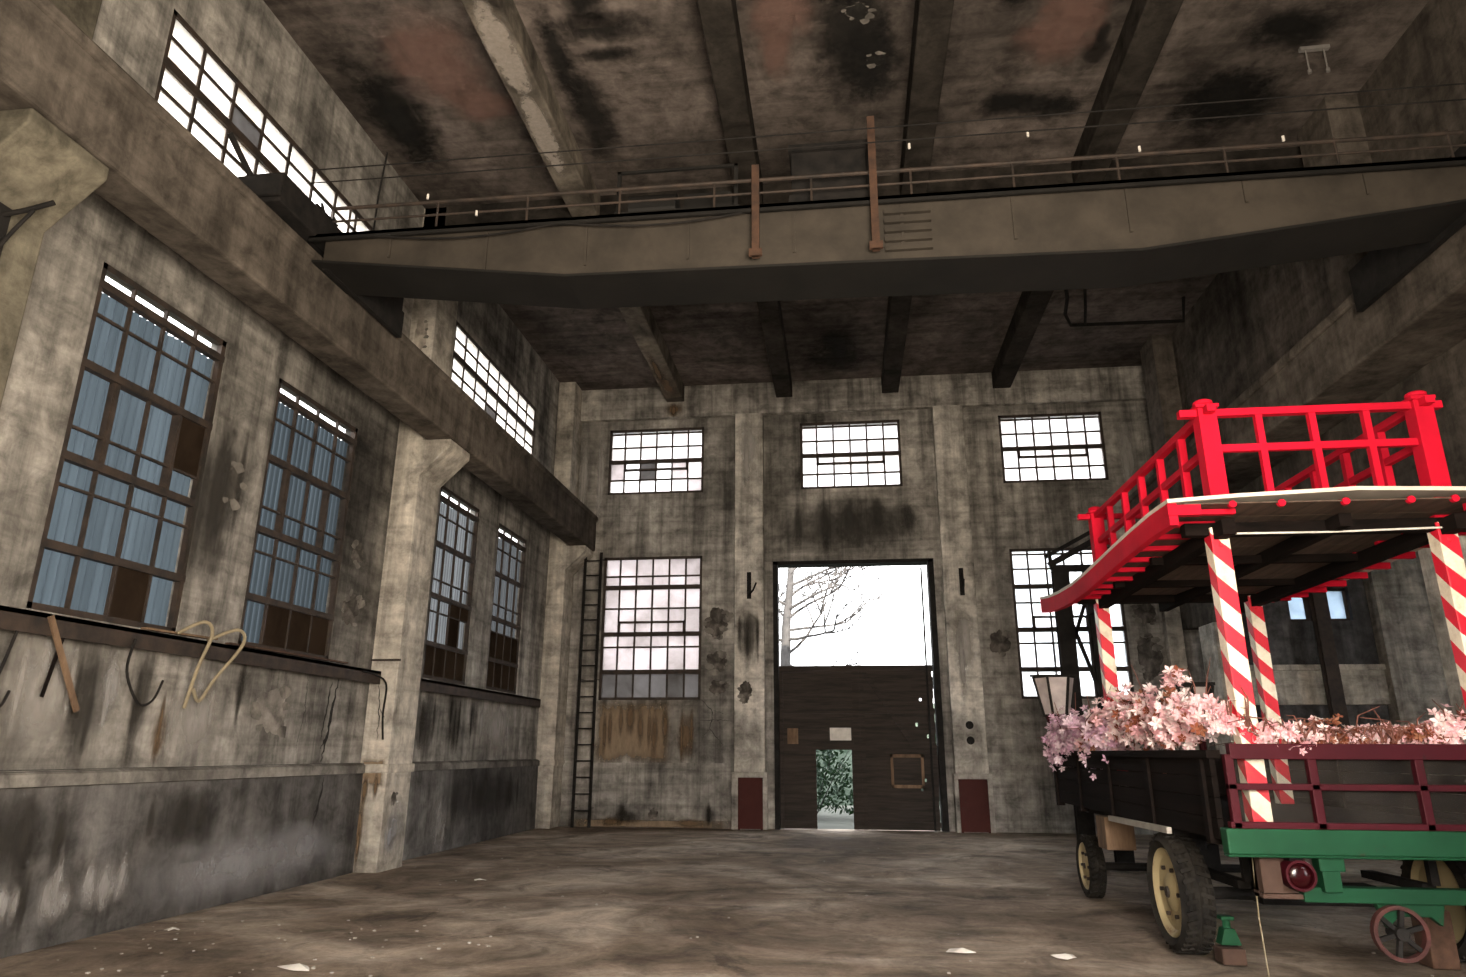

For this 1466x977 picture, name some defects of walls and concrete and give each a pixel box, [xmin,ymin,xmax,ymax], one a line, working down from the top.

water stain [536,0,648,148]
water stain [754,0,900,96]
water stain [12,654,119,752]
water stain [129,667,152,738]
water stain [236,667,246,716]
water stain [148,797,212,839]
water stain [0,805,66,928]
water stain [84,863,126,908]